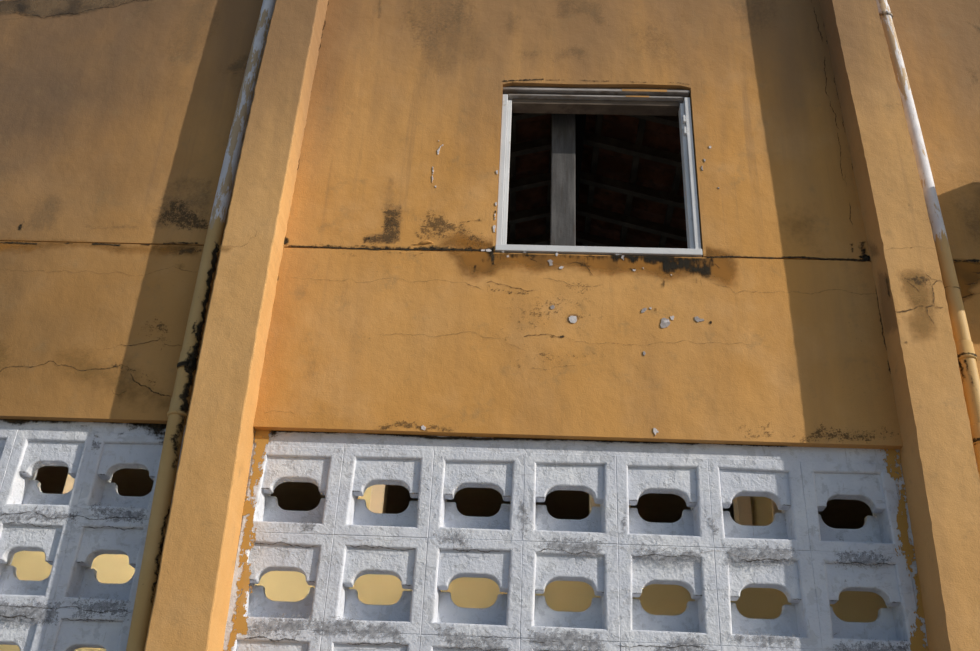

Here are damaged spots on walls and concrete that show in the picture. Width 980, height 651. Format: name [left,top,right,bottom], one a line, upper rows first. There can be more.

water stain [0,0,129,16]
water stain [159,200,209,230]
water stain [284,208,871,286]
crack [0,324,182,396]
water stain [102,242,220,468]
peeling [641,307,674,328]
water stain [905,274,931,334]
crack [876,275,960,373]
water stain [151,509,170,606]